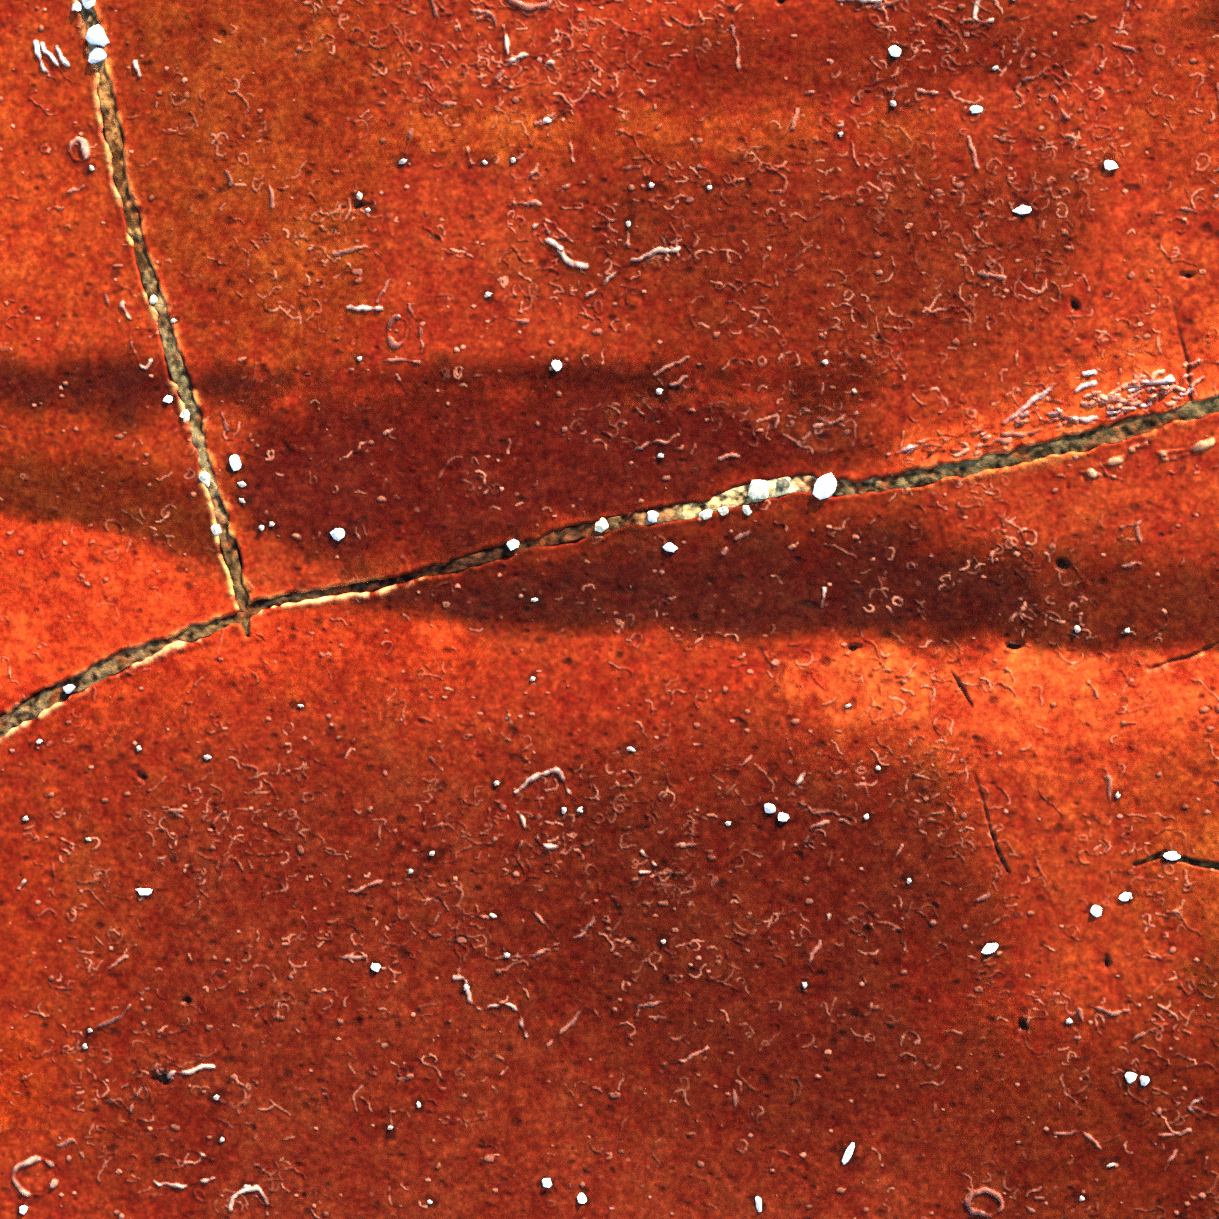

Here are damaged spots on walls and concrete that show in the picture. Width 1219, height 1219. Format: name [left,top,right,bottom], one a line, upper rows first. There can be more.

corrosion [144,0,365,358]
corrosion [364,109,838,160]
corrosion [867,118,919,147]
crack [0,0,1219,738]
corrosion [884,316,1219,469]
corrosion [0,518,474,722]
corrosion [780,642,1219,935]
corrosion [0,1063,42,1130]